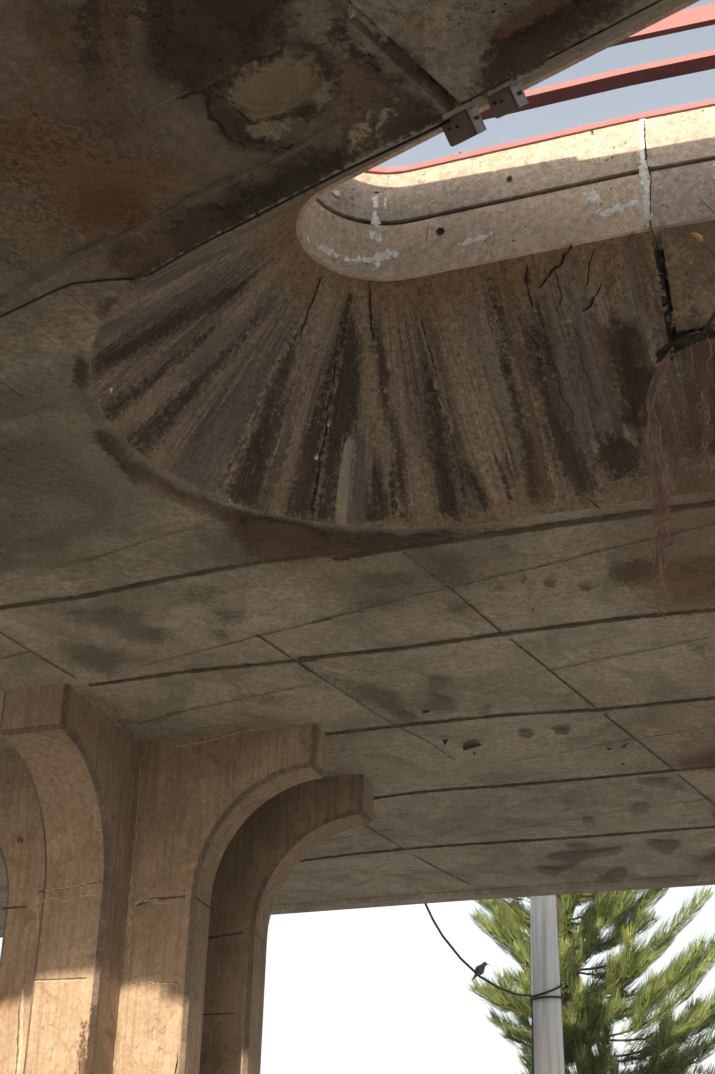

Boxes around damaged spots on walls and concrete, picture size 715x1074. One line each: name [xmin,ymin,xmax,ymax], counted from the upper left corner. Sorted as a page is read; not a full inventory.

leakage [468,0,638,102]
leakage [68,0,495,564]
crack [492,244,602,442]
leakage [480,222,715,505]
leakage [593,199,644,217]